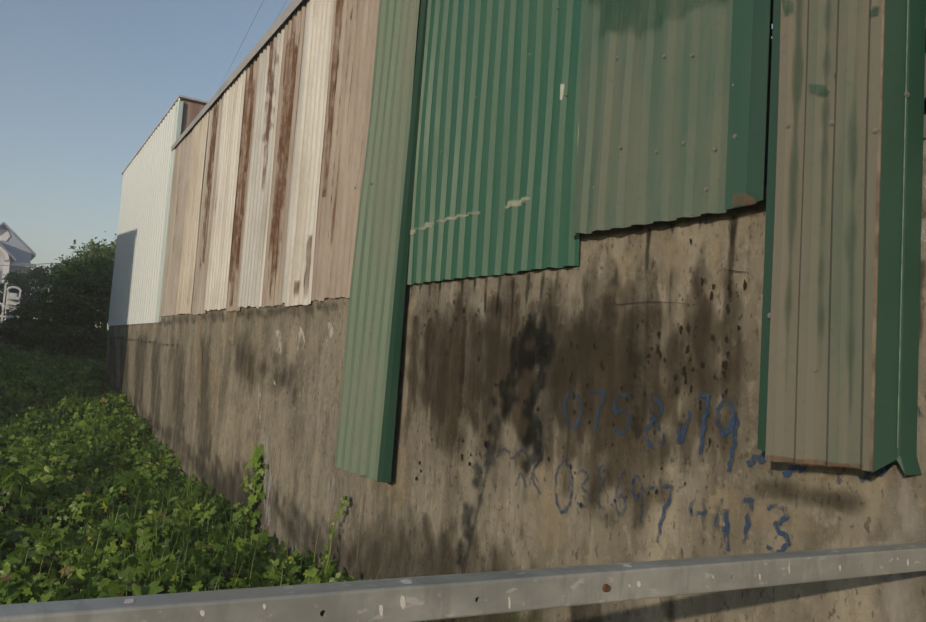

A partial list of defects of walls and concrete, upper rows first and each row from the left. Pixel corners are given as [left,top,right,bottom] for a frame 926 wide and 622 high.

corrosion [229,64,254,305]
corrosion [264,12,298,296]
corrosion [294,236,312,292]
corrosion [328,52,348,149]
water stain [725,215,747,314]
water stain [187,341,477,580]
water stain [417,274,709,546]